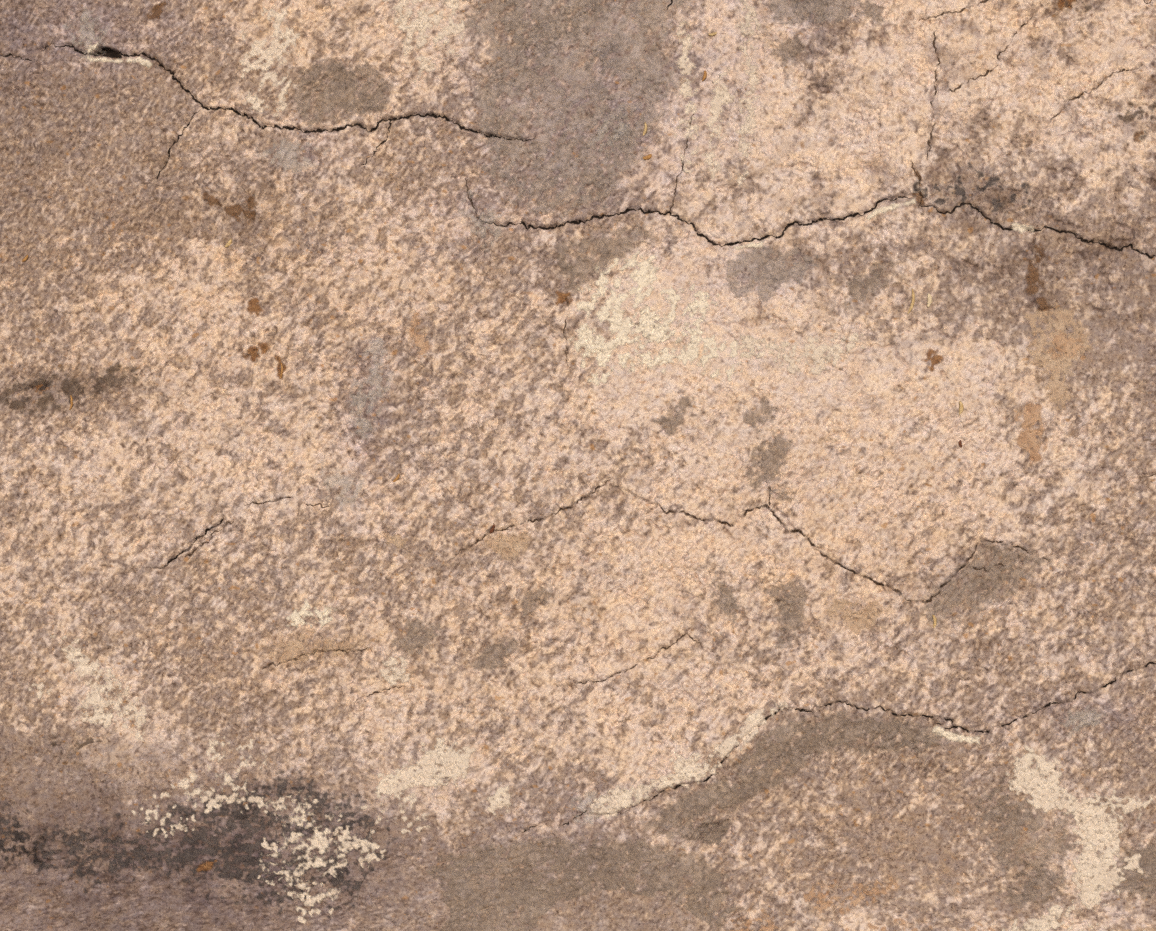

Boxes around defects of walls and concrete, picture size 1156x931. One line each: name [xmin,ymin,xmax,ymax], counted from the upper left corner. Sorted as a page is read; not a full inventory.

crack [0,43,536,181]
crack [465,0,1156,259]
crack [452,480,609,559]
crack [661,481,1047,603]
crack [563,634,713,686]
crack [523,662,1156,833]
damp [0,771,396,915]